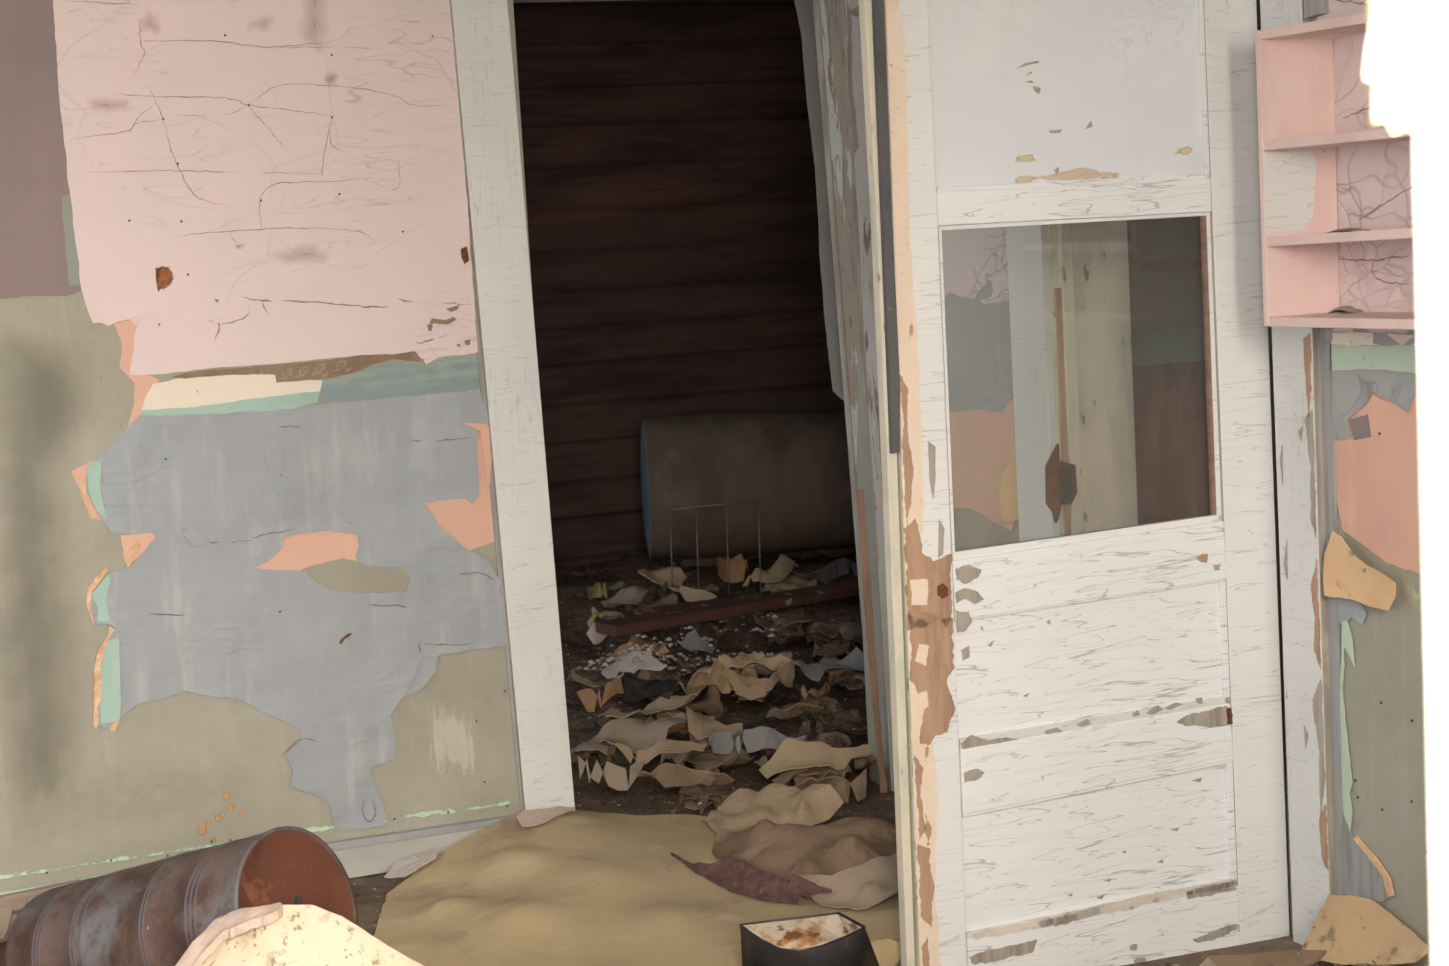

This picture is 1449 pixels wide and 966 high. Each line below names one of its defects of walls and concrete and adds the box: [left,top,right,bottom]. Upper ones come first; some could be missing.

peeling [1317,0,1369,20]
crack [64,1,454,248]
crack [1359,186,1414,220]
crack [1338,256,1409,285]
crack [210,297,475,344]
peeling [0,0,505,830]
peeling [885,0,1019,966]
peeling [1298,33,1423,903]
peeling [1196,554,1220,570]
peeling [1044,719,1092,734]
peeling [1132,697,1233,728]
peeling [969,878,1237,965]